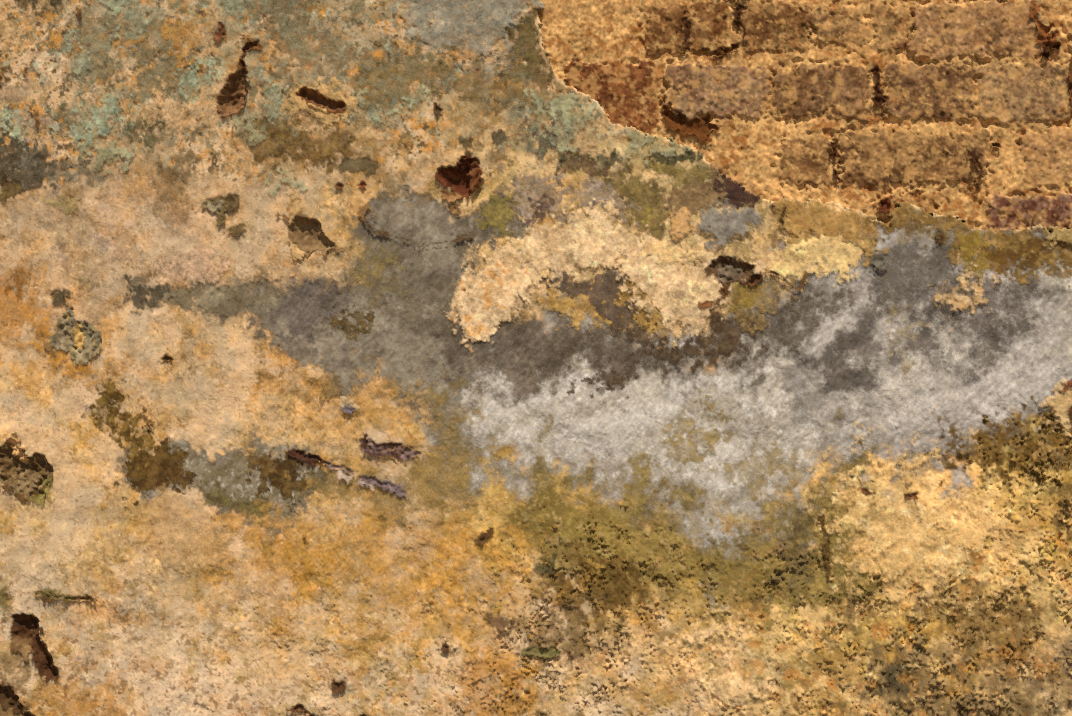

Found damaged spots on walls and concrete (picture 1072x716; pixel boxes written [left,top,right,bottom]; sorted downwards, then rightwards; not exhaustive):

damp [0,0,202,230]
spalling [661,102,722,143]
damp [124,0,1072,626]
spalling [0,432,54,505]
damp [81,379,328,555]
spalling [288,448,409,501]
spalling [359,434,420,461]
damp [484,526,667,672]
spalling [9,613,59,682]
damp [856,574,1072,716]
spalling [0,683,35,716]
damp [495,685,548,716]